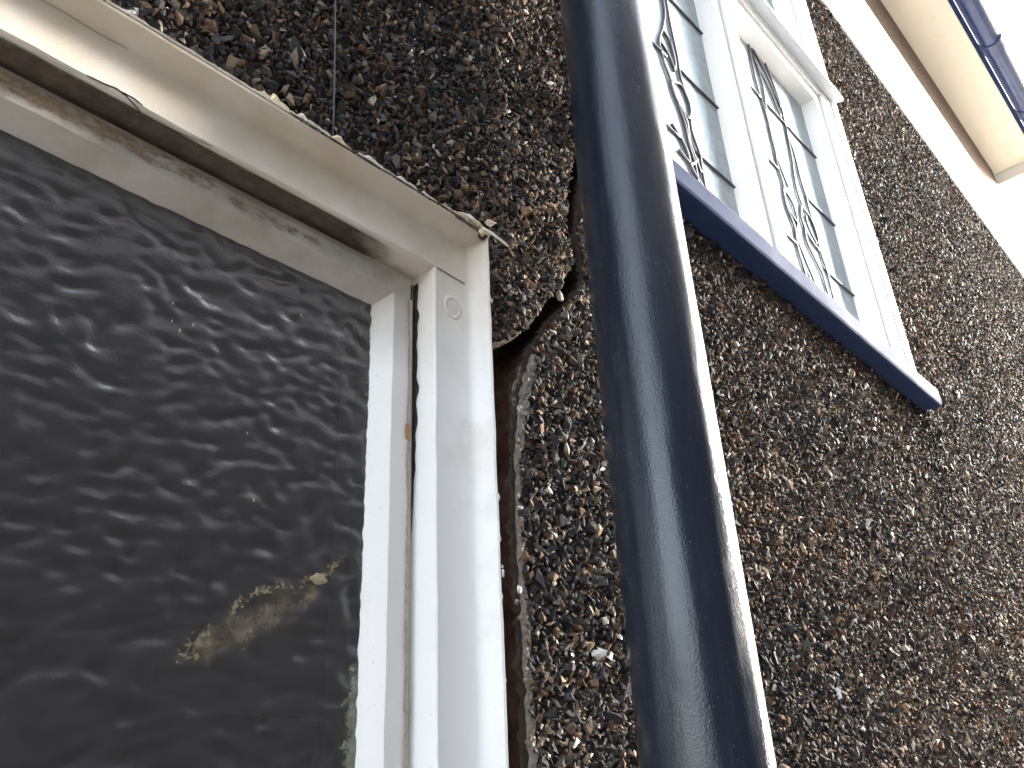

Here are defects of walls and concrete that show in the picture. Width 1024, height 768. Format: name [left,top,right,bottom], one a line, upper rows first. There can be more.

crack [502,157,581,353]
flaking render [502,354,538,768]